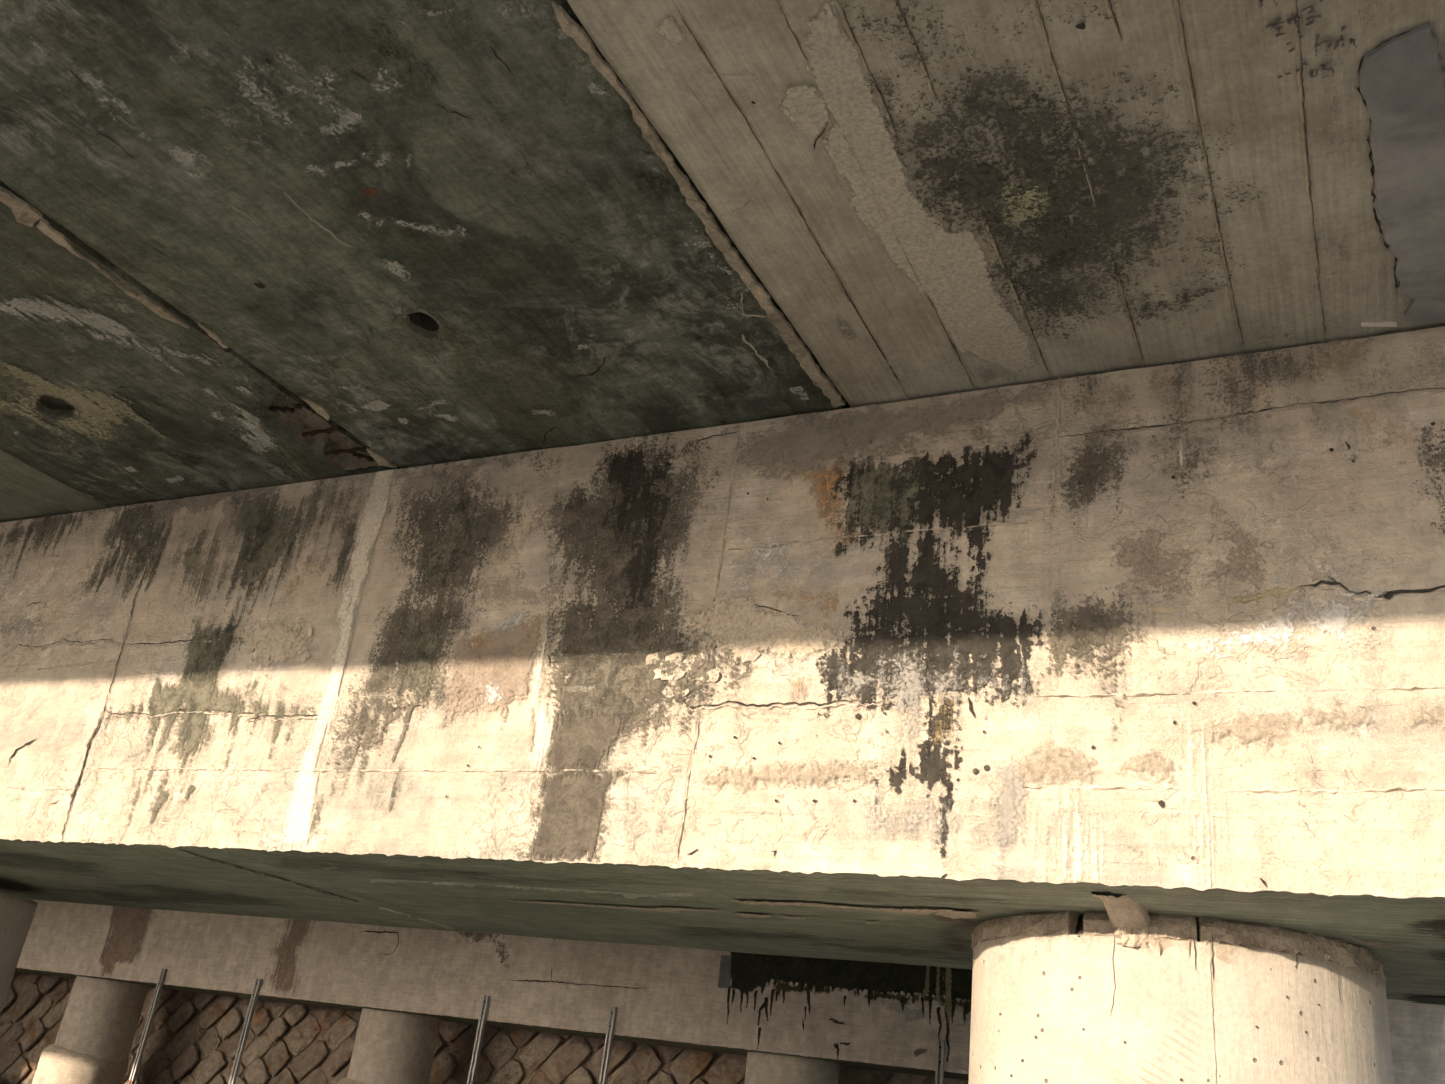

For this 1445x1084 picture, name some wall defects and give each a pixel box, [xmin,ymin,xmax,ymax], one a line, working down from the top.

damp [780,0,1259,390]
spalling [266,391,380,472]
damp [789,386,809,403]
damp [1161,335,1338,467]
crack [0,521,318,840]
damp [176,622,236,712]
damp [268,433,766,888]
damp [815,423,1148,867]
crack [1296,576,1445,603]
damp [1045,796,1103,882]
damp [676,890,1026,1062]
crack [1159,933,1217,1084]